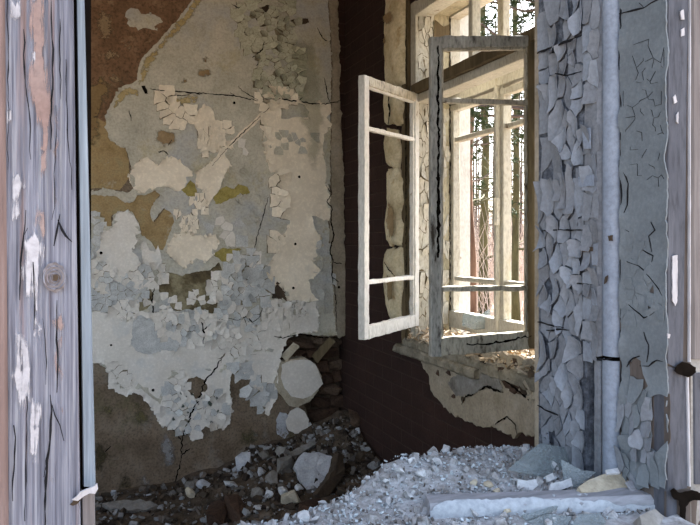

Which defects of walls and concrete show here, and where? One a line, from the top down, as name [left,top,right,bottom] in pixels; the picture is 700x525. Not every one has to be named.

crack [619,0,658,29]
crack [152,78,341,166]
crack [618,39,664,213]
peeling [91,0,345,441]
peeling [496,0,608,473]
crack [620,222,662,295]
peeling [605,0,696,490]
crack [173,357,222,482]